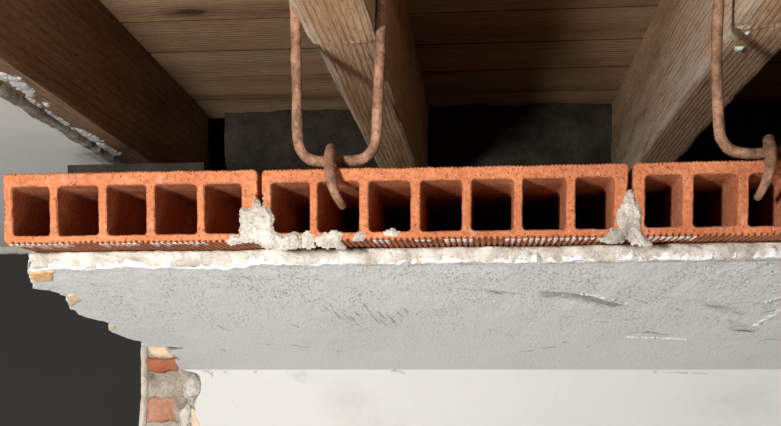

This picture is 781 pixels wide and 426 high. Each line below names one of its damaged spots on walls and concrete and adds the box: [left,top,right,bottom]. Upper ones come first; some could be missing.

flaking render [29,270,56,282]
flaking render [66,294,81,307]
flaking render [139,343,201,426]